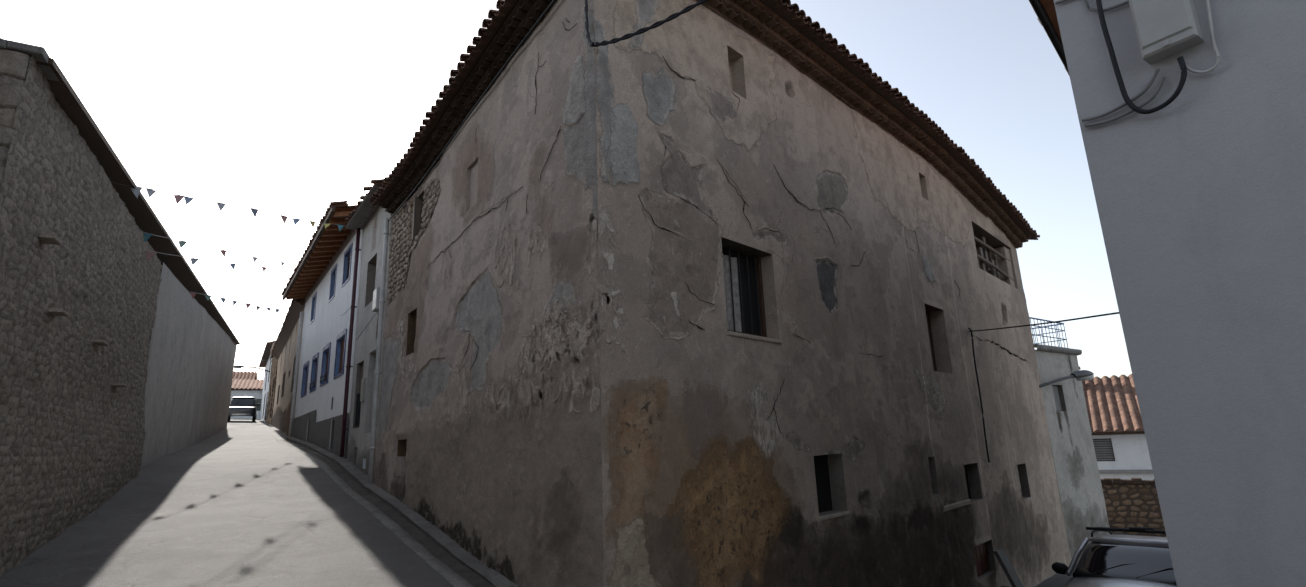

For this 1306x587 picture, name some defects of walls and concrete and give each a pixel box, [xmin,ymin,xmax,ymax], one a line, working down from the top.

crack [427,52,561,269]
peeling [617,57,740,341]
crack [716,159,752,229]
crack [773,164,865,267]
peeling [815,169,849,214]
flaking render [387,176,441,370]
spalling [814,257,838,313]
peeling [493,289,624,414]
spalling [610,517,662,587]
water stain [743,503,976,587]